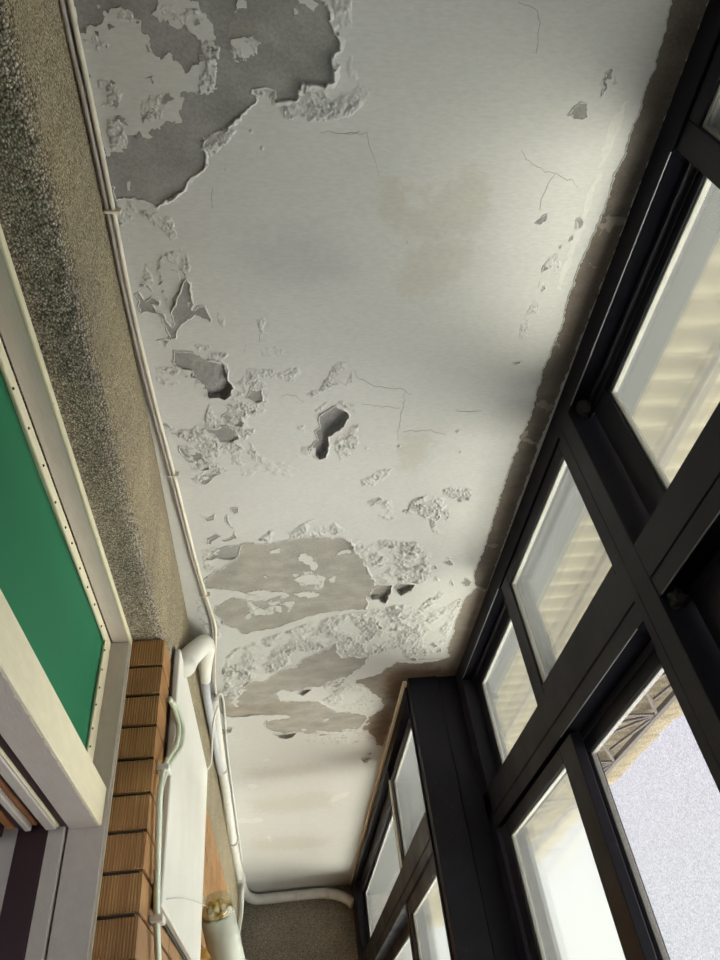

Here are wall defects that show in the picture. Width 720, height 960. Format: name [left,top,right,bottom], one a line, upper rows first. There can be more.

peeling [66,0,376,485]
crack [353,369,444,434]
peeling [195,0,709,763]